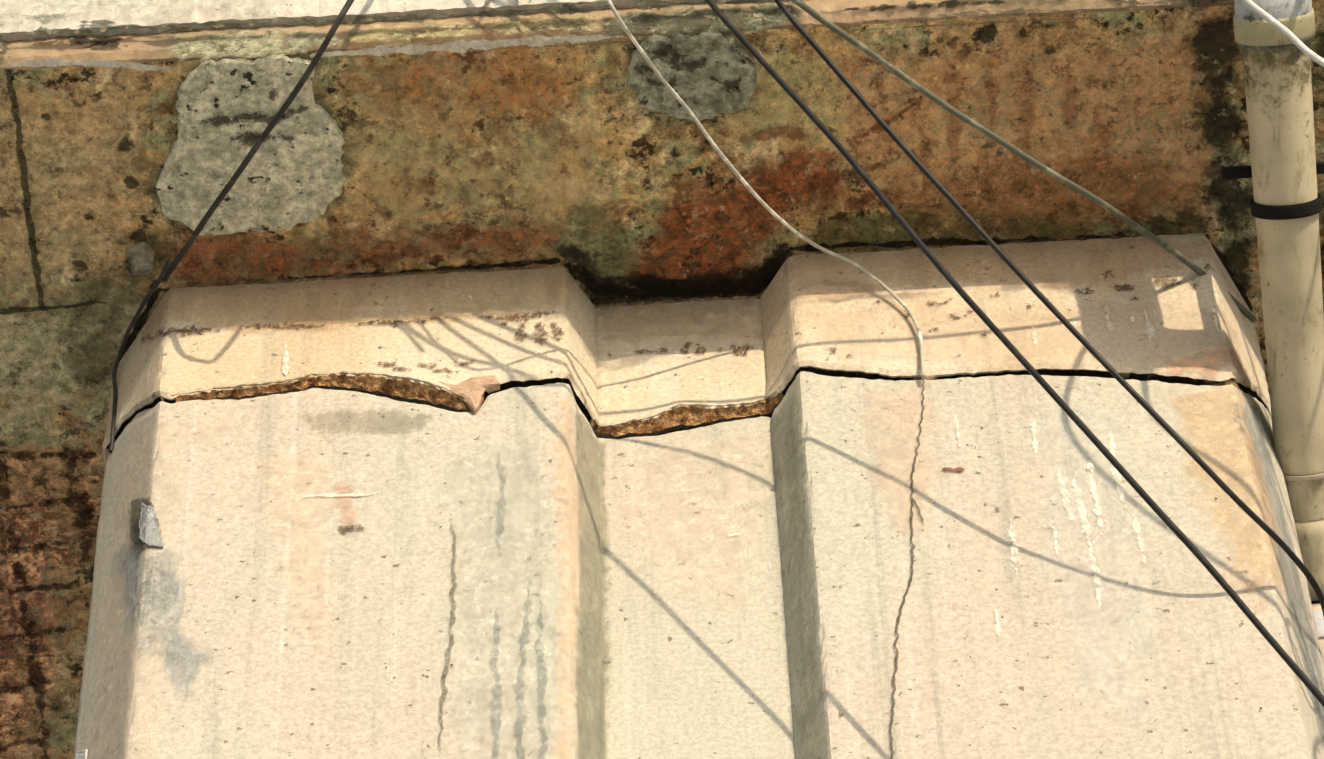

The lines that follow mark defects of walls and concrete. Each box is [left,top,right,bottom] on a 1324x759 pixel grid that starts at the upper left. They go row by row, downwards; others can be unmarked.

corrosion [625,125,901,280]
water stain [119,544,202,683]
crack [0,367,1267,759]
efflorescence [1008,518,1018,569]
efflorescence [1057,456,1103,605]
efflorescence [1109,433,1146,563]